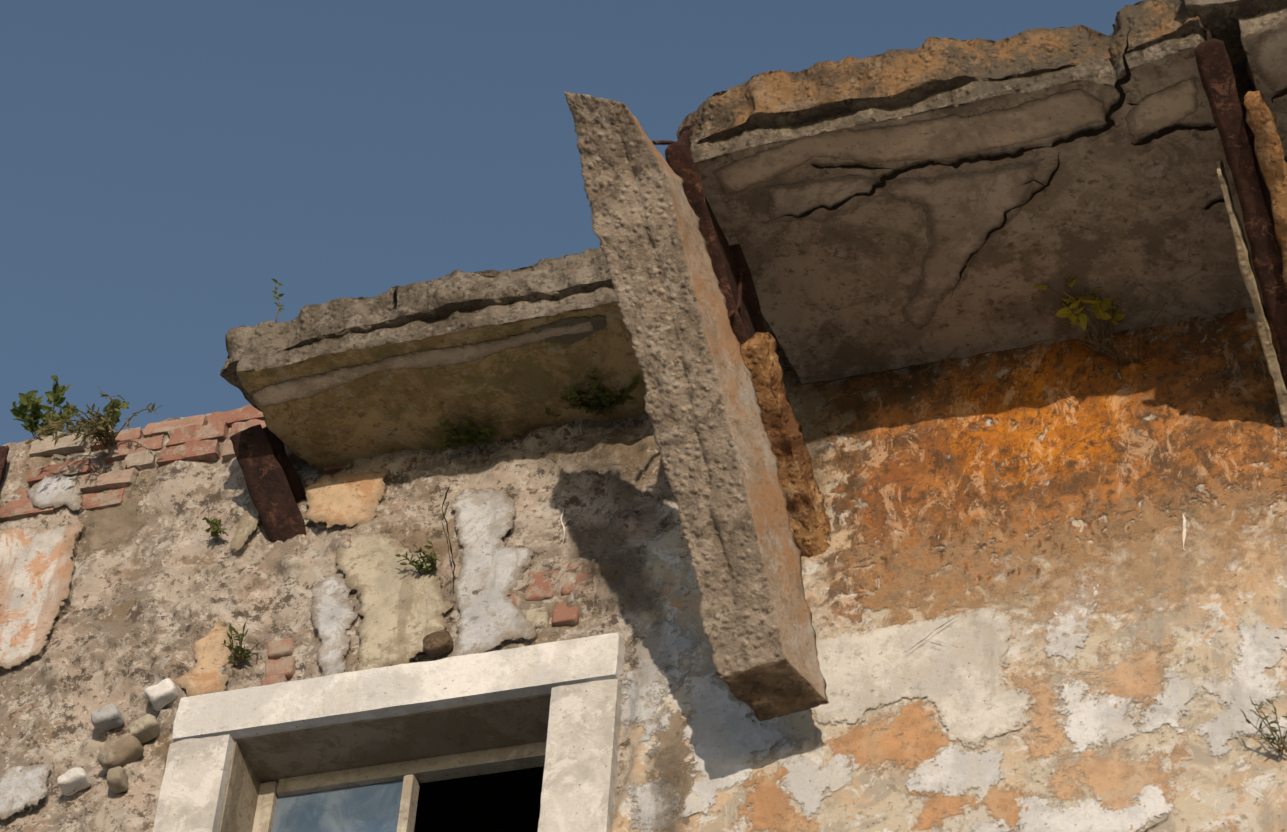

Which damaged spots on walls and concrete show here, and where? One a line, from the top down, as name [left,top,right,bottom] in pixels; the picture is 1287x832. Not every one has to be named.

crack [761,30,1217,297]
spalling [70,483,149,562]
corrosion [809,308,1287,631]
peeling [620,573,1287,832]